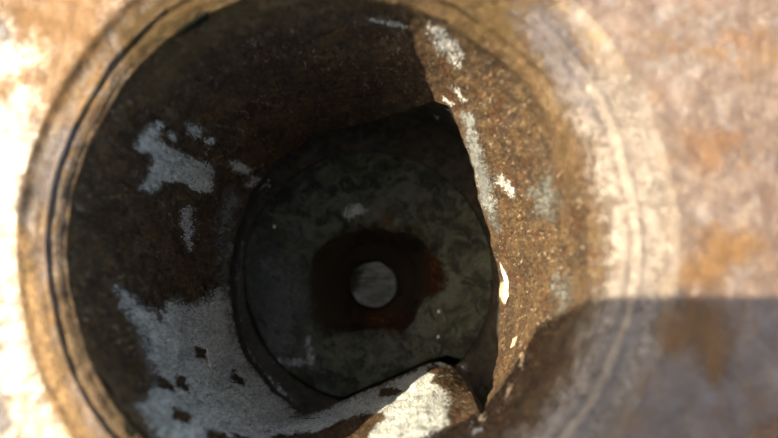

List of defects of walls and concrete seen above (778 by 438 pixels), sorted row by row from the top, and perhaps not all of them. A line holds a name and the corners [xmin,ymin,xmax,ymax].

leakage [394,0,464,29]
rust [307,223,444,337]
rust [155,372,190,394]
rust [231,369,245,386]
rust [378,387,401,397]
rust [427,366,471,394]
rust [172,406,192,424]
rust [206,428,249,438]
rust [272,412,384,438]